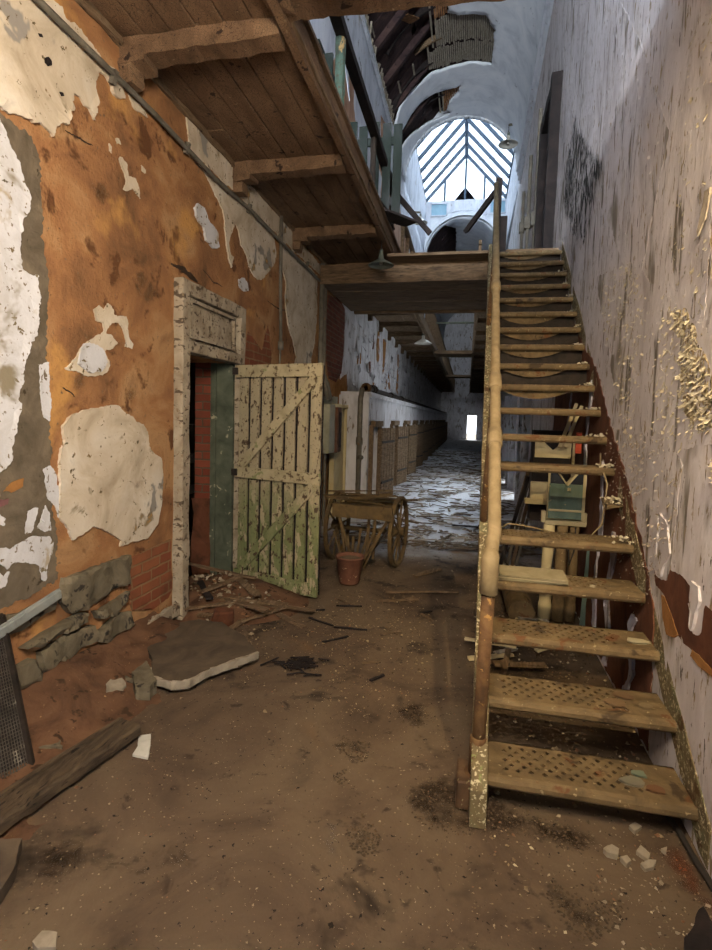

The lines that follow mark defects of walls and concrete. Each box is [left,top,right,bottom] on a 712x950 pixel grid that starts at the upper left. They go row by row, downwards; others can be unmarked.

peeling [0,0,180,625]
peeling [185,117,431,406]
peeling [553,0,712,677]
flaking render [599,656,653,693]
flaking render [637,728,649,751]